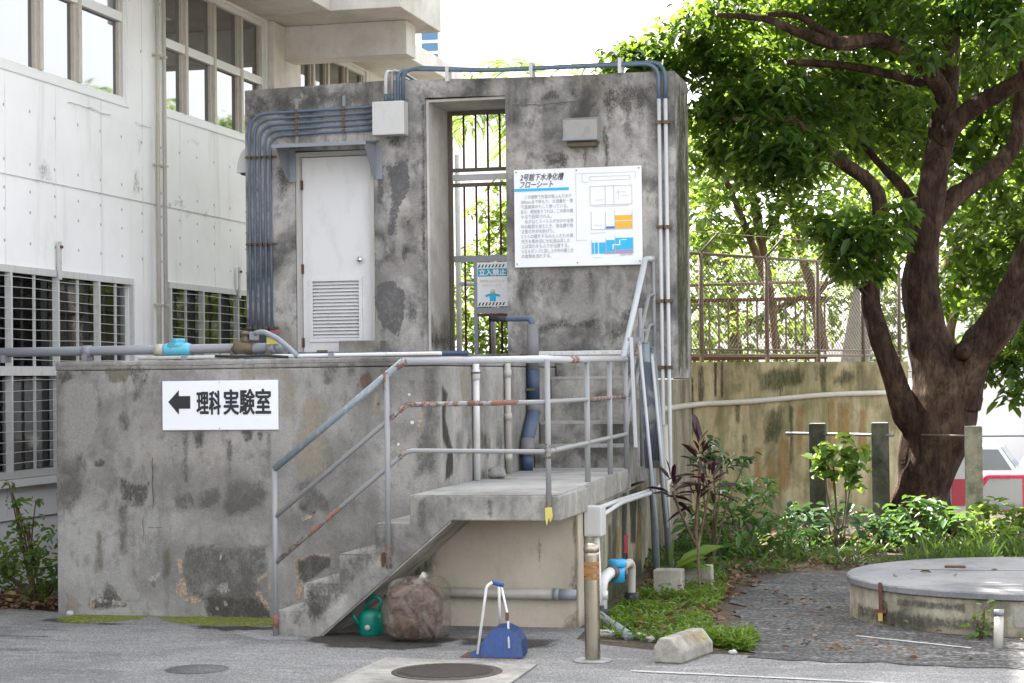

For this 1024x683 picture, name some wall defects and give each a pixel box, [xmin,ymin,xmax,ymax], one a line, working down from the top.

water stain [377,159,425,255]
water stain [375,280,416,336]
water stain [765,369,804,390]
water stain [817,365,860,391]
rust [389,400,519,420]
water stain [766,406,793,456]
water stain [119,479,149,572]
rust [277,506,341,564]
water stain [185,548,485,649]
water stain [308,529,379,621]
water stain [526,639,553,647]